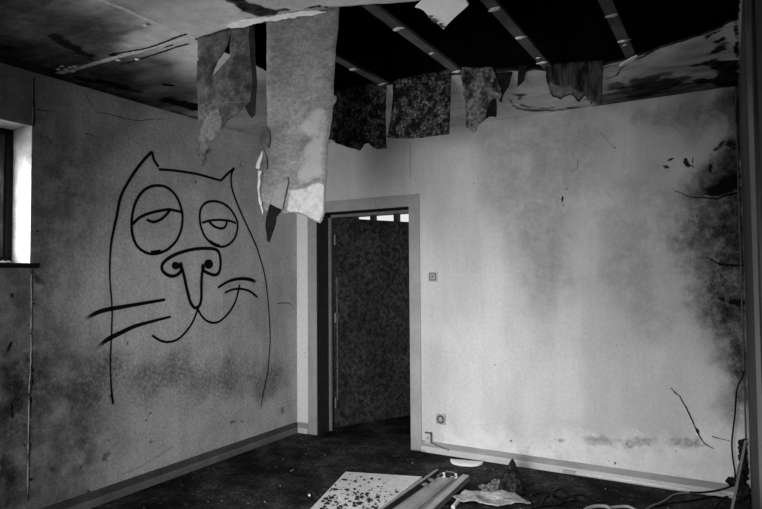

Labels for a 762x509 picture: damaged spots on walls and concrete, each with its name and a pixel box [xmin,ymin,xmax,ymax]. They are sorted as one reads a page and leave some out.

flaking render [226,11,324,28]
damp [47,33,94,61]
damp [161,98,198,111]
crack [671,388,729,449]